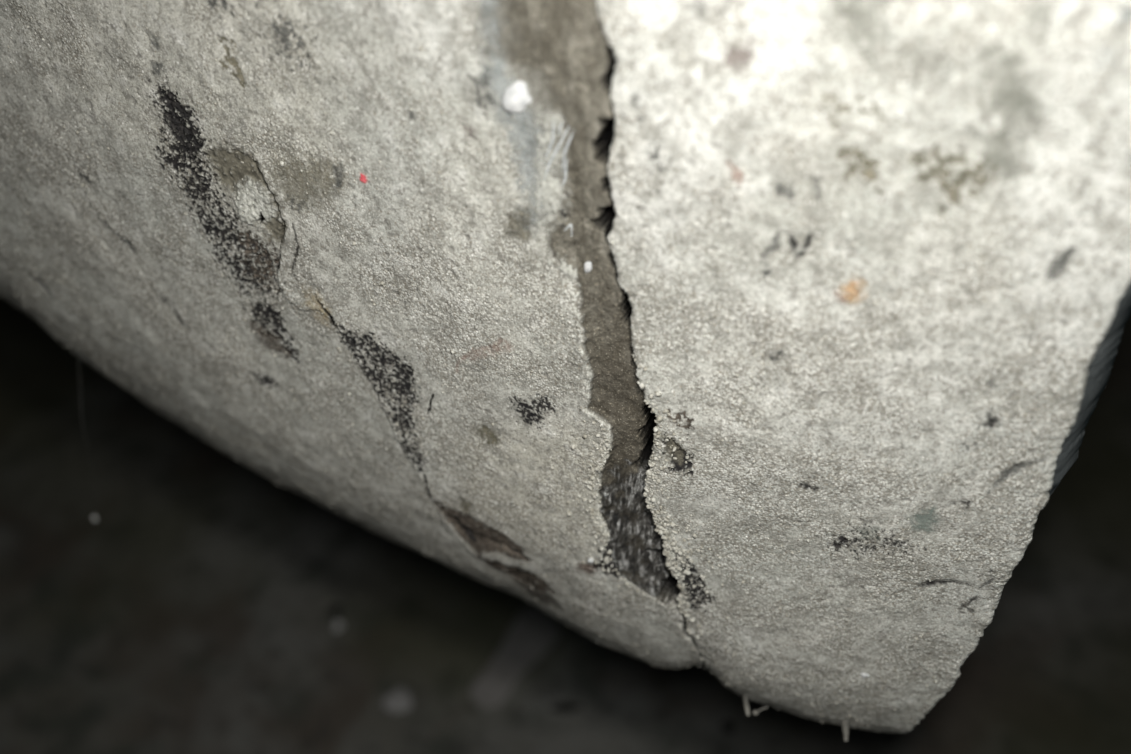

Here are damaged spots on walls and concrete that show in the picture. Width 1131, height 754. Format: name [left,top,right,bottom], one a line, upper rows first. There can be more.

crack [260,213,299,297]
spalling [467,0,715,612]
crack [595,48,633,317]
crack [550,354,751,667]